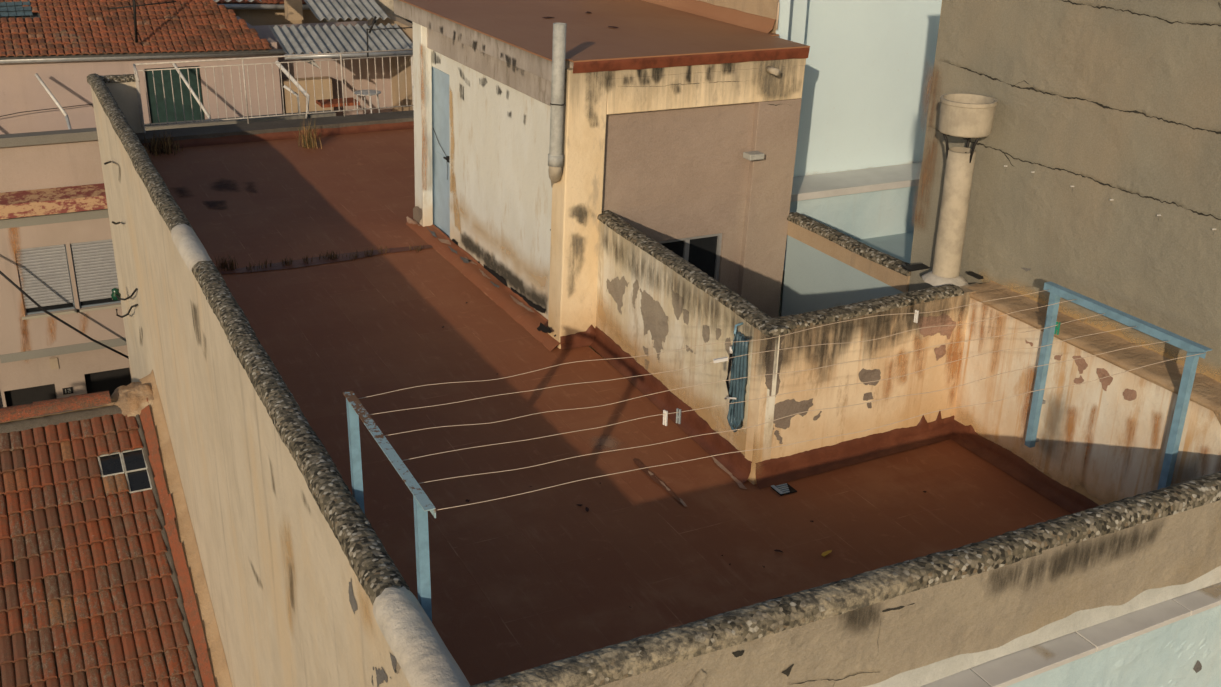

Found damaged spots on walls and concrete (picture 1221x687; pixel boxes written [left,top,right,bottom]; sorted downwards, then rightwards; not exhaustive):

crack [1062,0,1221,26]
crack [939,51,1221,134]
crack [926,117,1221,220]
leakage [461,235,547,309]
peeling [606,276,732,370]
peeling [764,334,822,444]
rust [1023,369,1035,423]
peeling [1053,354,1113,391]
peeling [1123,388,1137,401]